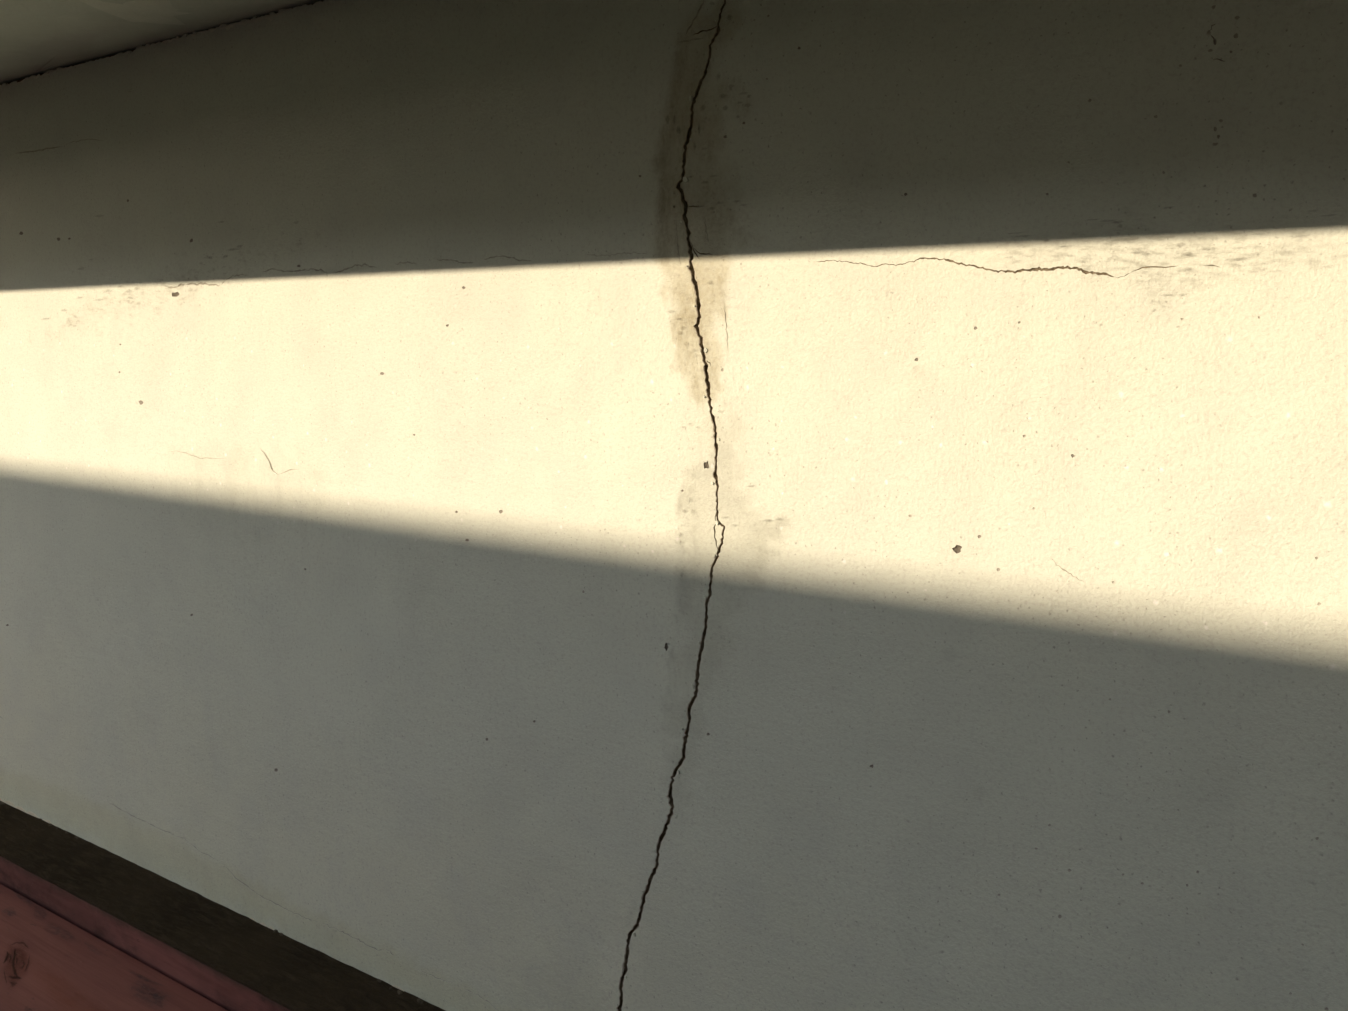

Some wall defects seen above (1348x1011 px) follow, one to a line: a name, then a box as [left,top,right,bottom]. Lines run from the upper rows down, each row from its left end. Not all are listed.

crack [165,255,532,289]
crack [820,257,1221,278]
crack [260,448,296,475]
crack [616,0,726,1011]